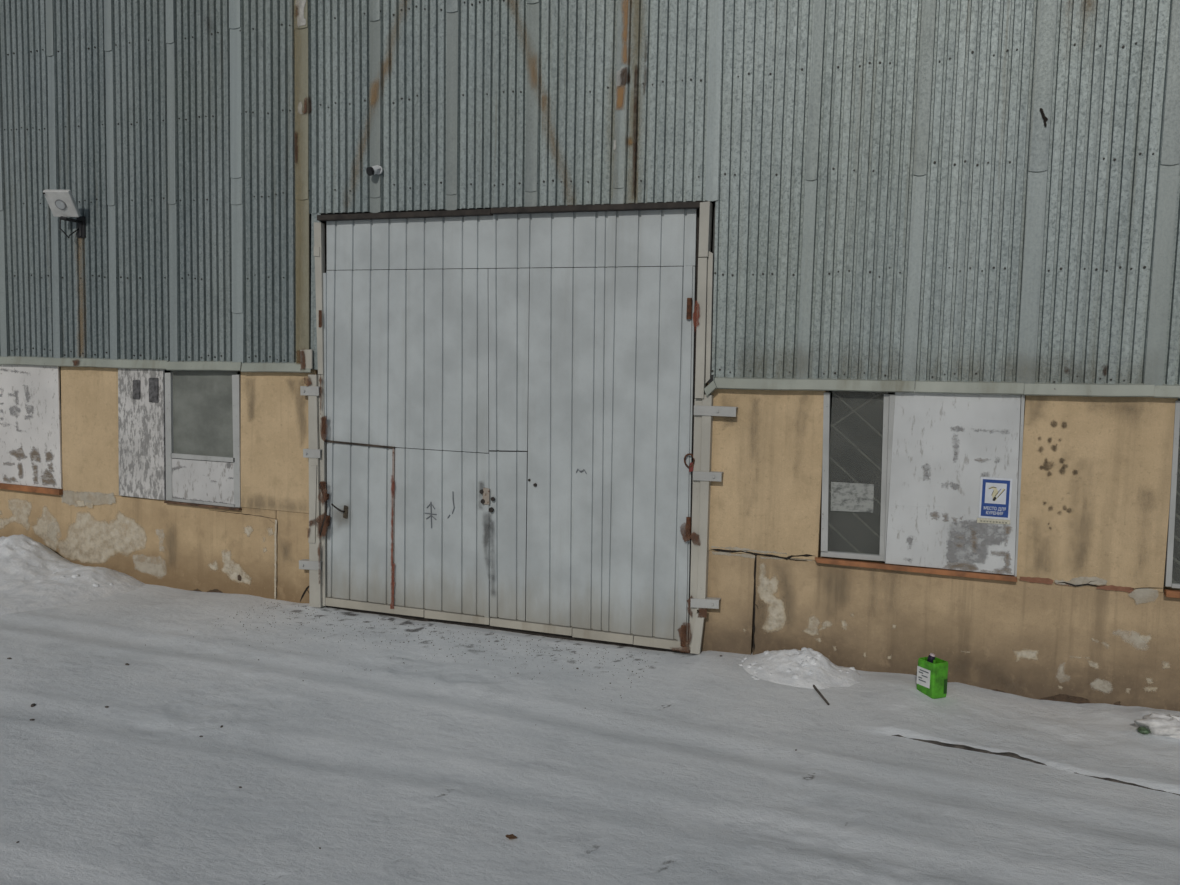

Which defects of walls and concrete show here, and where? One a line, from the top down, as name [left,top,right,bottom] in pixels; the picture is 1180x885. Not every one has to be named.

rust [614,0,646,193]
peeling [0,369,34,432]
peeling [3,446,57,486]
flaking render [0,498,164,576]
flaking render [208,550,251,585]
rust [680,524,700,546]
flaking render [711,546,812,632]
crack [711,549,813,653]
peeling [930,511,1072,586]
flaking render [1097,585,1134,593]
flaking render [1039,656,1130,706]